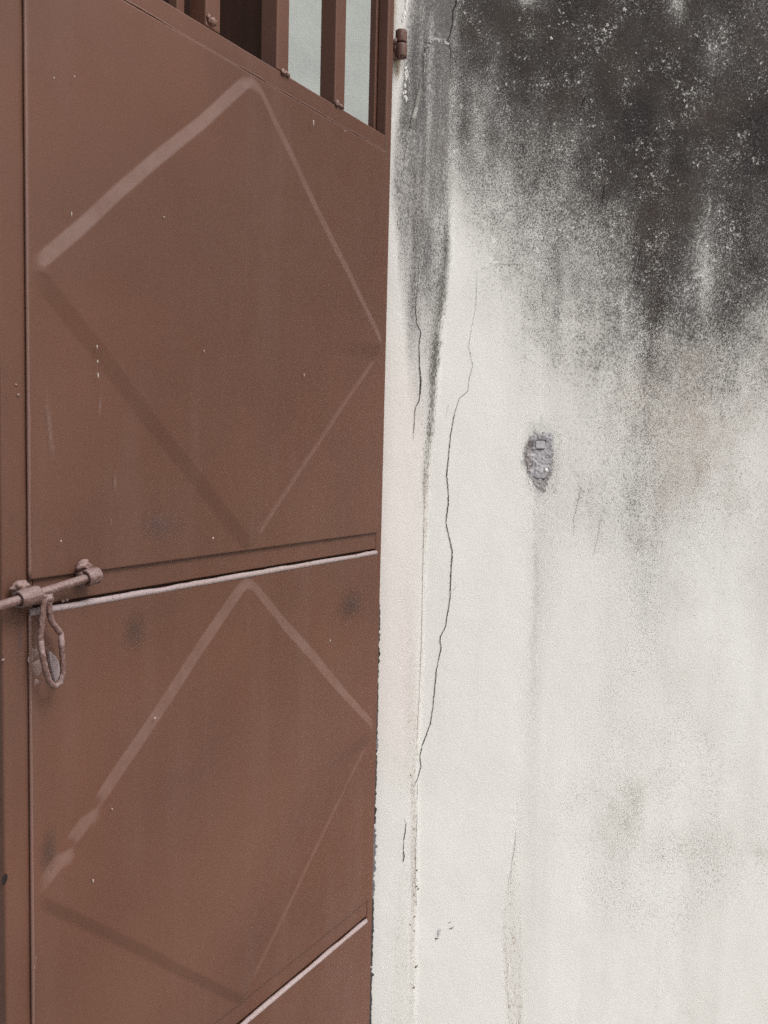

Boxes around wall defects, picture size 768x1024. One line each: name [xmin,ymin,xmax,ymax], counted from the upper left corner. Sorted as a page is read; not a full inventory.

crack [403,264,529,905]
flaking render [524,425,559,496]
damp [395,0,768,530]